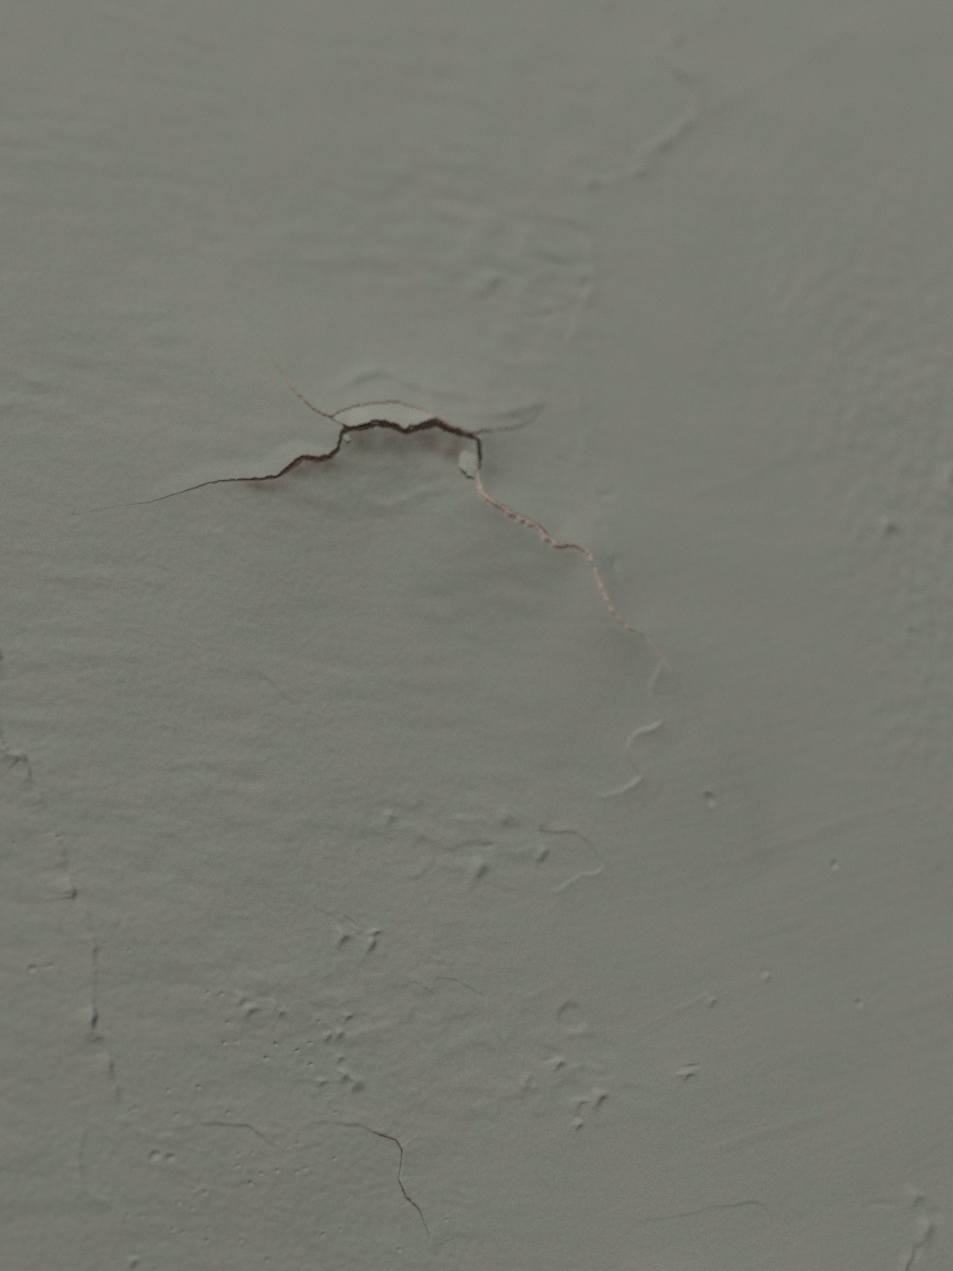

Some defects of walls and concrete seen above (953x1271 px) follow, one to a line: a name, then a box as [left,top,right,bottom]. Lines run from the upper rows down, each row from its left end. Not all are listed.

peeling [72,241,771,885]